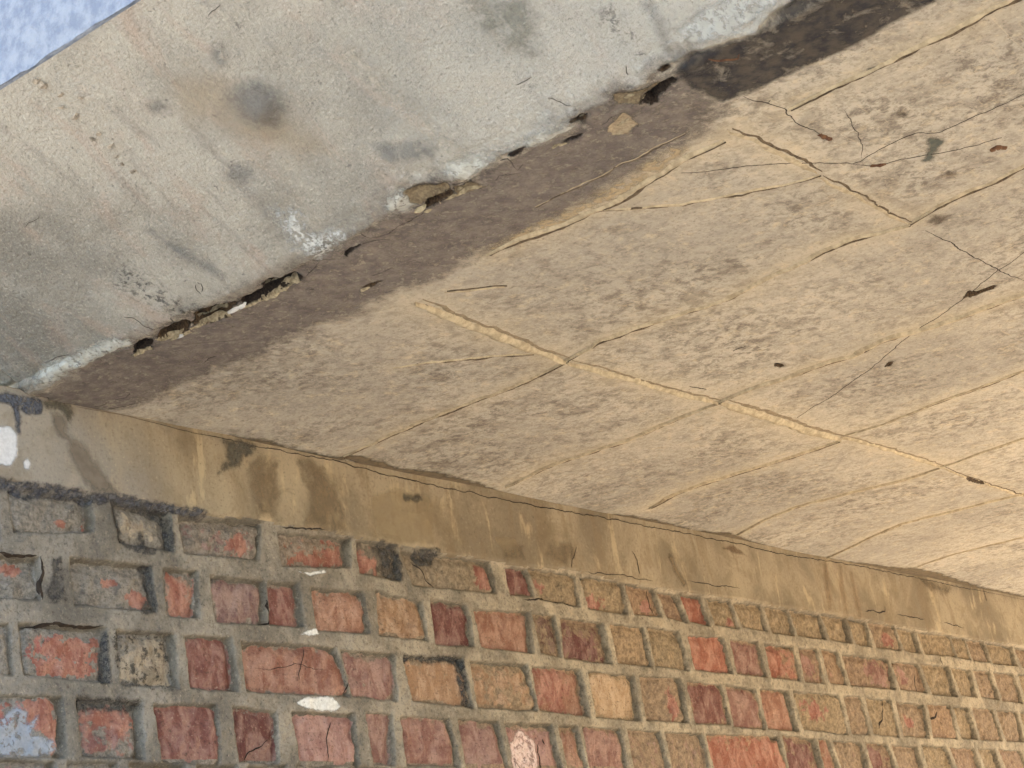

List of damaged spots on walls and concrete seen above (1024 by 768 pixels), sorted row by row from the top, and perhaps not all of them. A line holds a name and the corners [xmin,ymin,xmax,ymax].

spalling [552,113,587,149]
peeling [607,65,677,135]
crack [689,94,1023,173]
spalling [403,182,486,213]
spalling [133,271,303,357]
leakage [0,0,934,615]
crack [797,230,1024,418]
crack [80,394,1023,600]
crack [571,547,654,615]
crack [255,650,322,676]